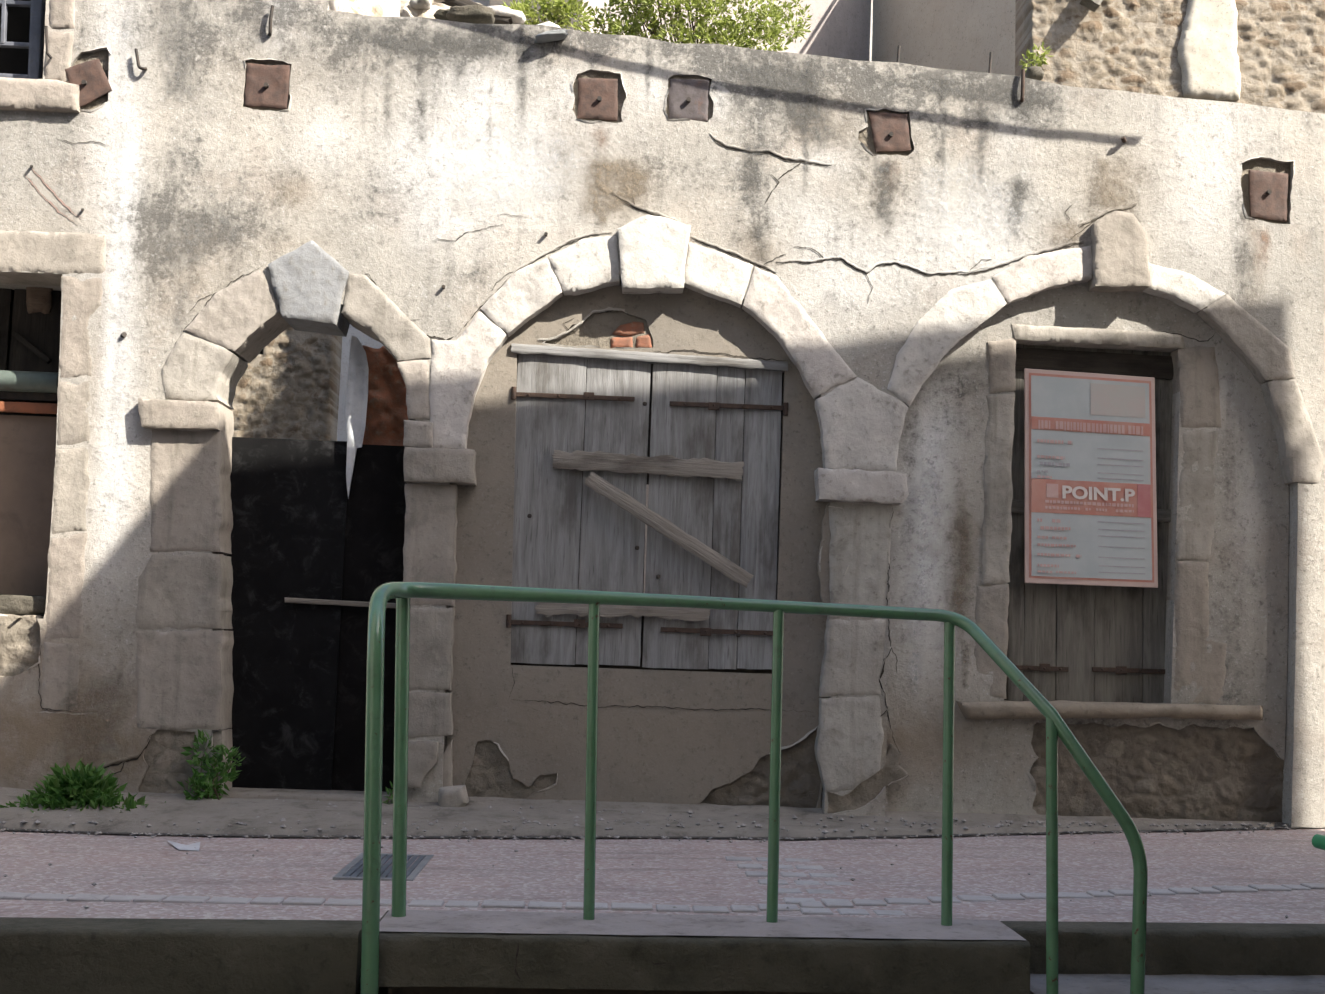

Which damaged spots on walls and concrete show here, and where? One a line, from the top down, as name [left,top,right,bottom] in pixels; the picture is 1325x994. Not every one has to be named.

crack [710,132,832,203]
crack [411,165,1137,342]
spalling [138,730,197,794]
spalling [465,740,558,799]
spalling [701,726,909,813]
spalling [1027,722,1284,822]